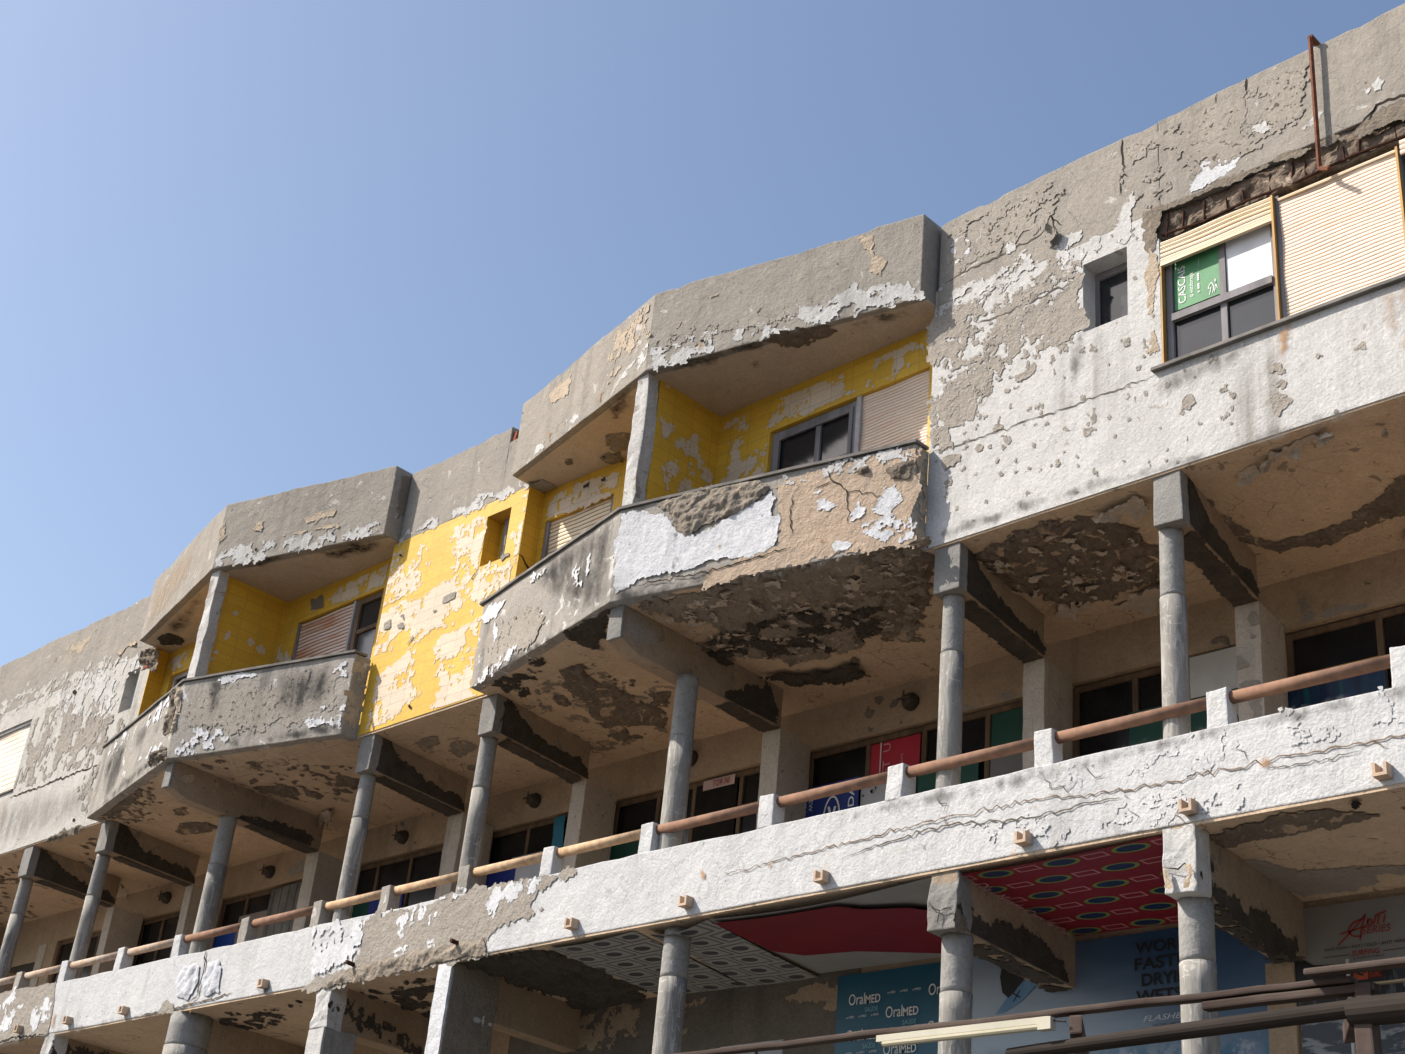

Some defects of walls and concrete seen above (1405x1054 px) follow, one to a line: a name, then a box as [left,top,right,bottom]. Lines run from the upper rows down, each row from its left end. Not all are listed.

peeling [549,373,571,403]
peeling [607,61,1405,687]
peeling [545,433,631,519]
crack [638,470,882,586]
peeling [0,476,671,868]
peeling [1211,635,1340,745]
peeling [1371,686,1405,726]
spalling [0,866,37,925]
peeling [971,813,1069,846]
crack [715,734,1405,877]
peeling [1099,729,1405,964]
peeling [219,866,648,1054]